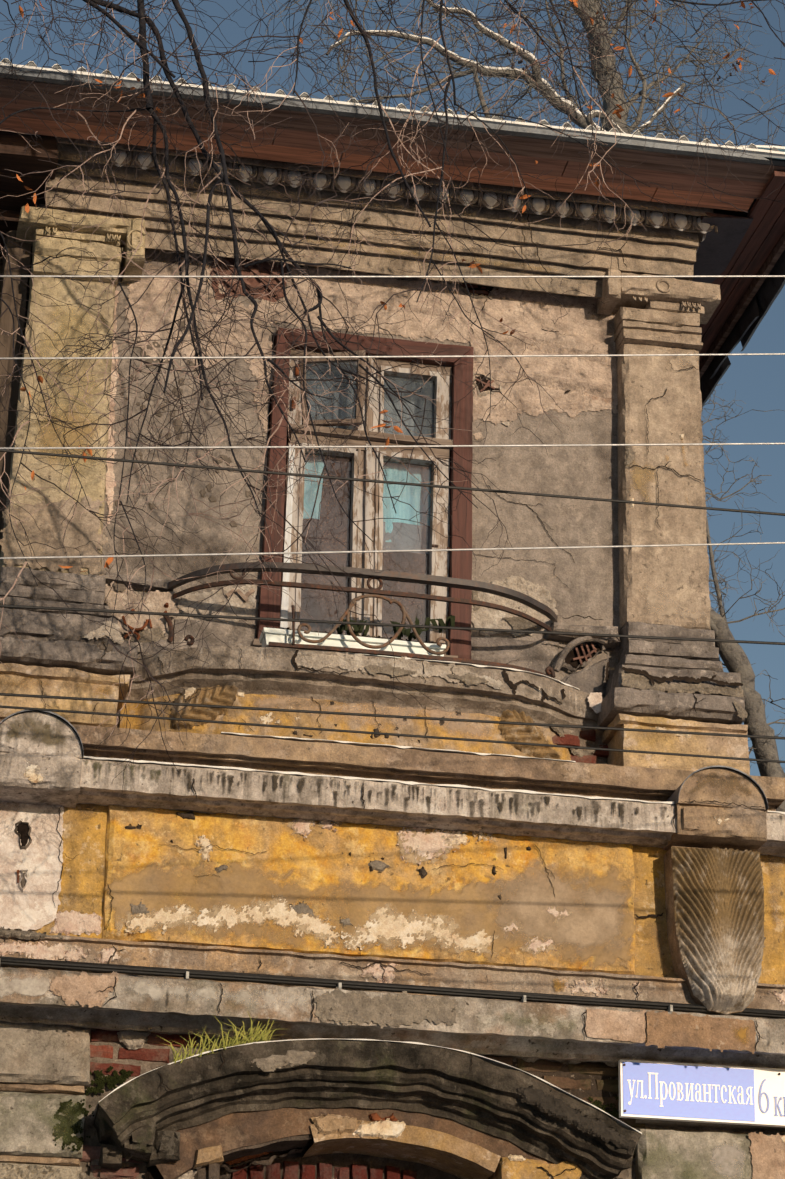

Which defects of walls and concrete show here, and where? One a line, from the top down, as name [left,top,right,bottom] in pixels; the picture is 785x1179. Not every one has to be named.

peeling [0,256,618,654]
crack [475,485,575,587]
crack [502,660,566,704]
crack [556,615,743,711]
leakage [124,765,351,806]
leakage [368,784,436,810]
leakage [450,789,558,818]
flaking render [0,801,558,1008]
peeling [287,963,458,1028]
peeling [311,1113,406,1139]
crack [537,1166,578,1179]
peeling [712,1132,785,1179]